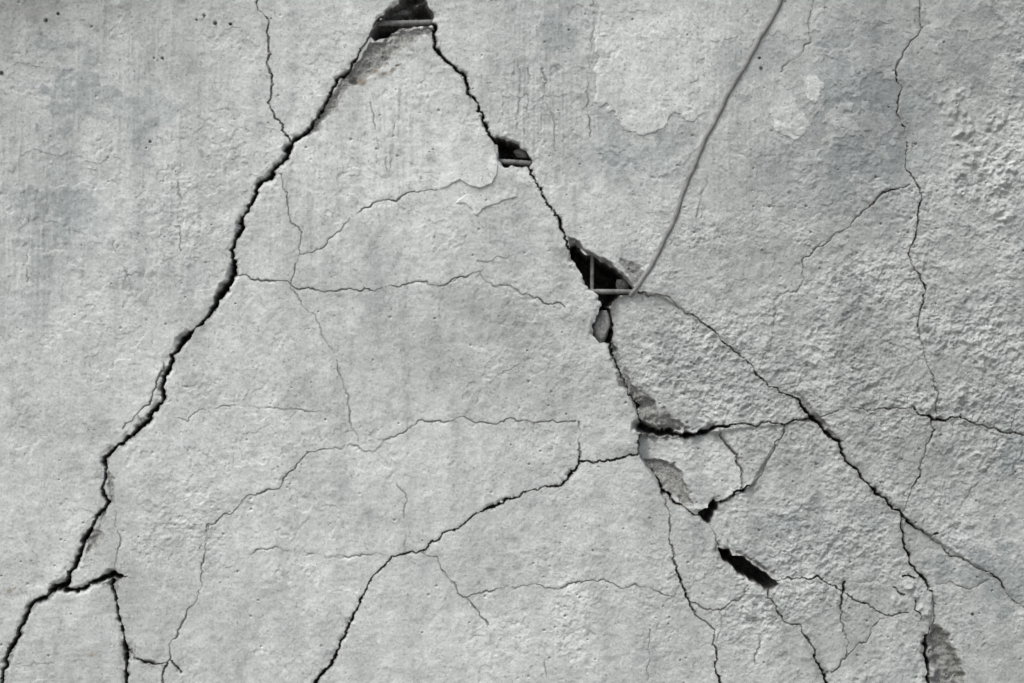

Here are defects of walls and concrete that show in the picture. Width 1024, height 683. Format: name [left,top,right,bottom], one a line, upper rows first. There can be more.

peeling [434,103,518,216]
spalling [566,235,646,291]
crack [0,0,580,683]
crack [313,0,1024,683]
spalling [643,456,697,508]
spalling [729,546,779,580]